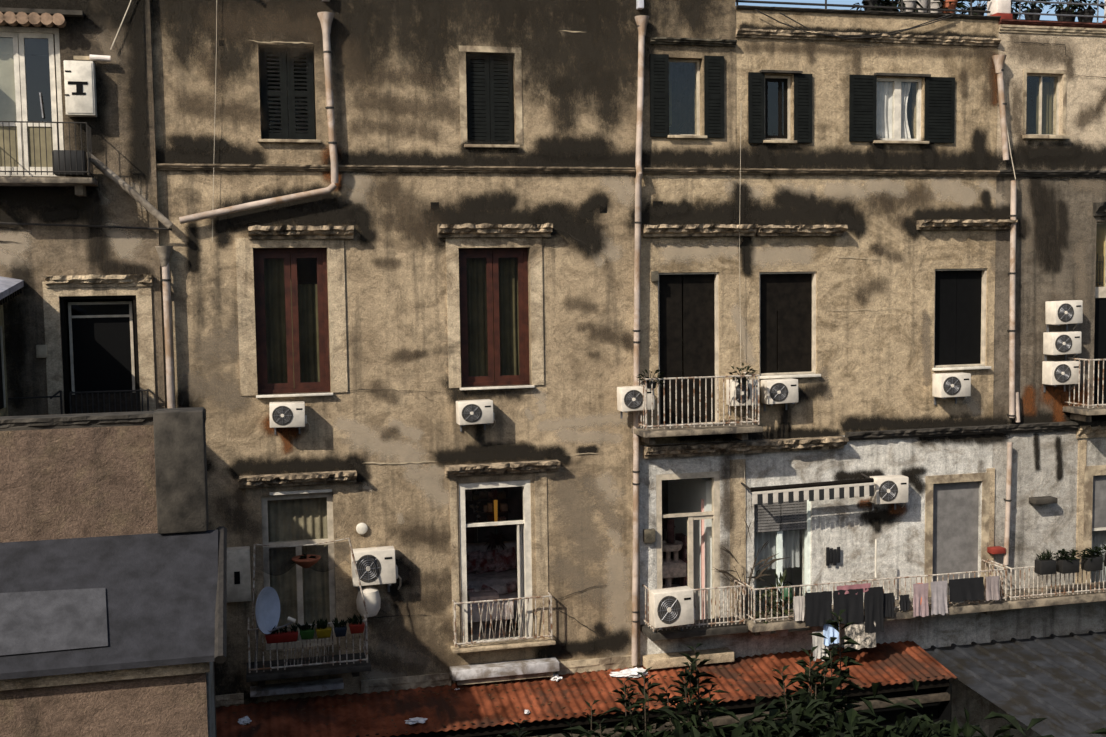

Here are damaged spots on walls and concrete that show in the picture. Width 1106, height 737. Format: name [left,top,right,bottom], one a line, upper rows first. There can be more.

water stain [0,0,1106,275]
water stain [175,387,199,408]
water stain [442,378,522,402]
rust [262,417,301,453]
water stain [214,456,370,539]
water stain [435,424,597,466]
water stain [834,469,884,481]
water stain [677,383,1078,470]
water stain [860,506,897,532]
rust [889,503,907,515]
water stain [901,467,926,493]
water stain [1055,437,1063,480]